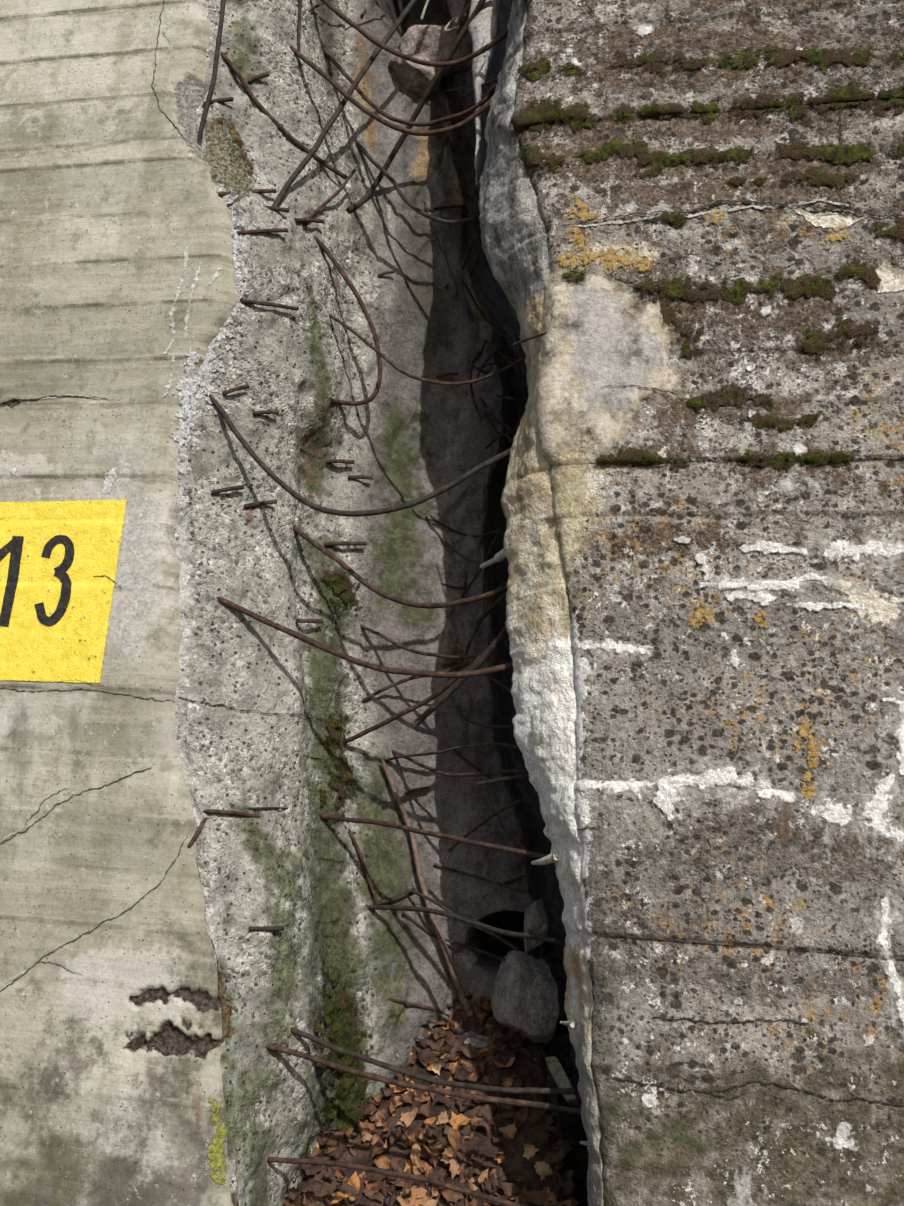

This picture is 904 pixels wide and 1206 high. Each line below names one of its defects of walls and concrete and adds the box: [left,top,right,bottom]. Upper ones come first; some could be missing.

crack [558,108,904,227]
spalling [174,0,604,1206]
water stain [674,531,904,650]
crack [0,679,325,721]
crack [0,767,152,844]
water stain [569,619,796,961]
water stain [810,697,904,855]
crack [0,834,224,1044]
spalling [124,986,224,1063]
water stain [866,897,904,1034]